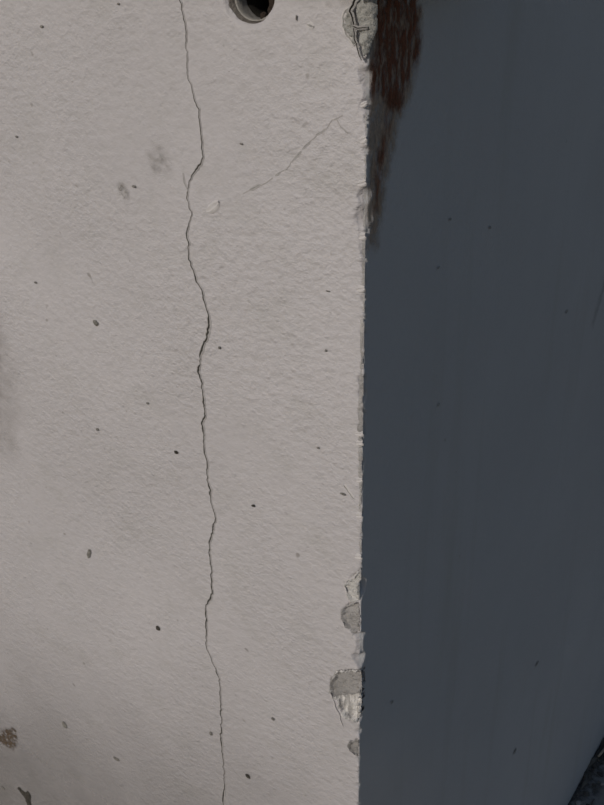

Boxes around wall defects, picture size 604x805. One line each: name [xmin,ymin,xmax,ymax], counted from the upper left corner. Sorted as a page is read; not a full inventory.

peeling [341,5,358,46]
crack [243,115,348,194]
rust [367,0,422,244]
crack [179,0,230,805]
spalling [329,668,366,727]
spalling [347,739,359,757]